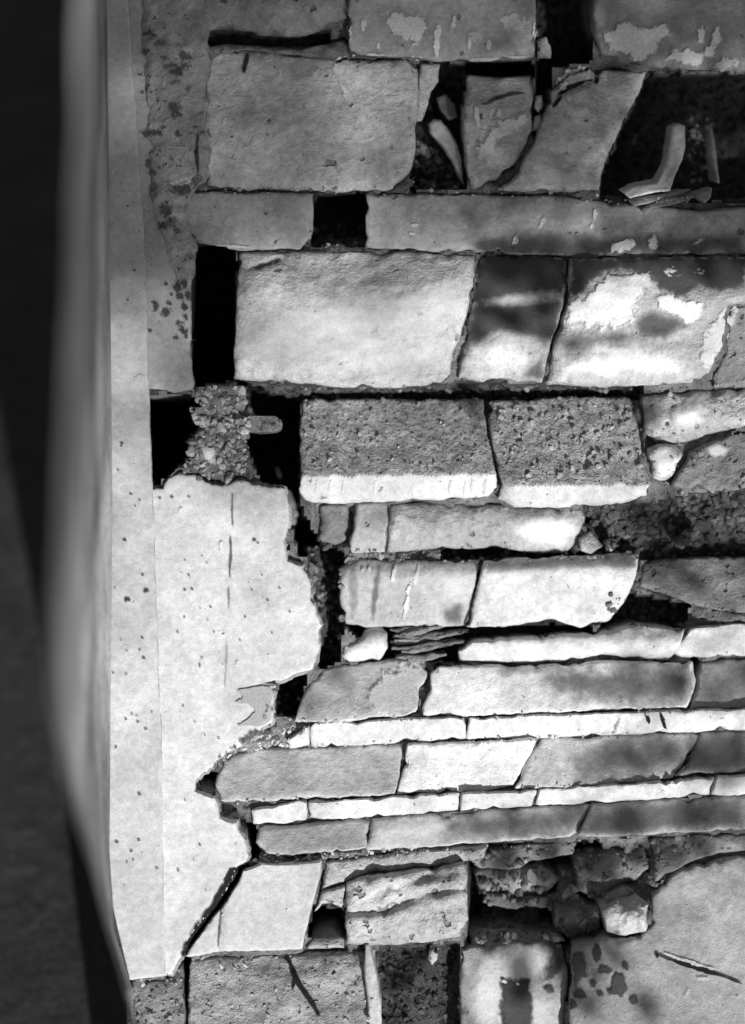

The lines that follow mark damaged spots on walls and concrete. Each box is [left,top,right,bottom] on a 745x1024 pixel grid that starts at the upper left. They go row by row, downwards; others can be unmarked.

spalling [183,385,253,484]
flaking render [213,686,280,772]
crack [181,863,248,1013]
crack [285,955,321,1017]
damp [472,933,638,1024]
crack [655,953,742,984]